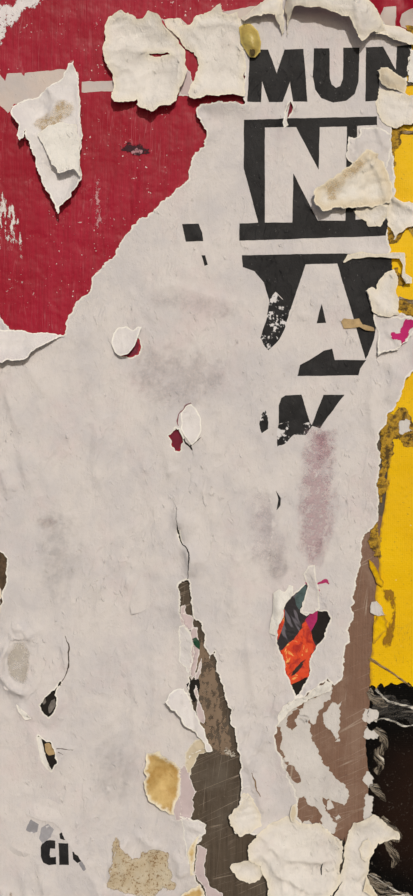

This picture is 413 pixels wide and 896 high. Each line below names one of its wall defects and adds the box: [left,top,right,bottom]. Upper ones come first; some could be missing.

peeling [10,62,83,214]
peeling [102,0,413,240]
peeling [343,252,412,317]
peeling [111,326,141,356]
peeling [399,419,412,435]
crack [176,507,190,579]
peeling [269,585,293,635]
peeling [301,565,320,614]
peeling [370,601,388,644]
crack [60,636,70,684]
peeling [144,688,213,876]
peeling [229,793,400,896]